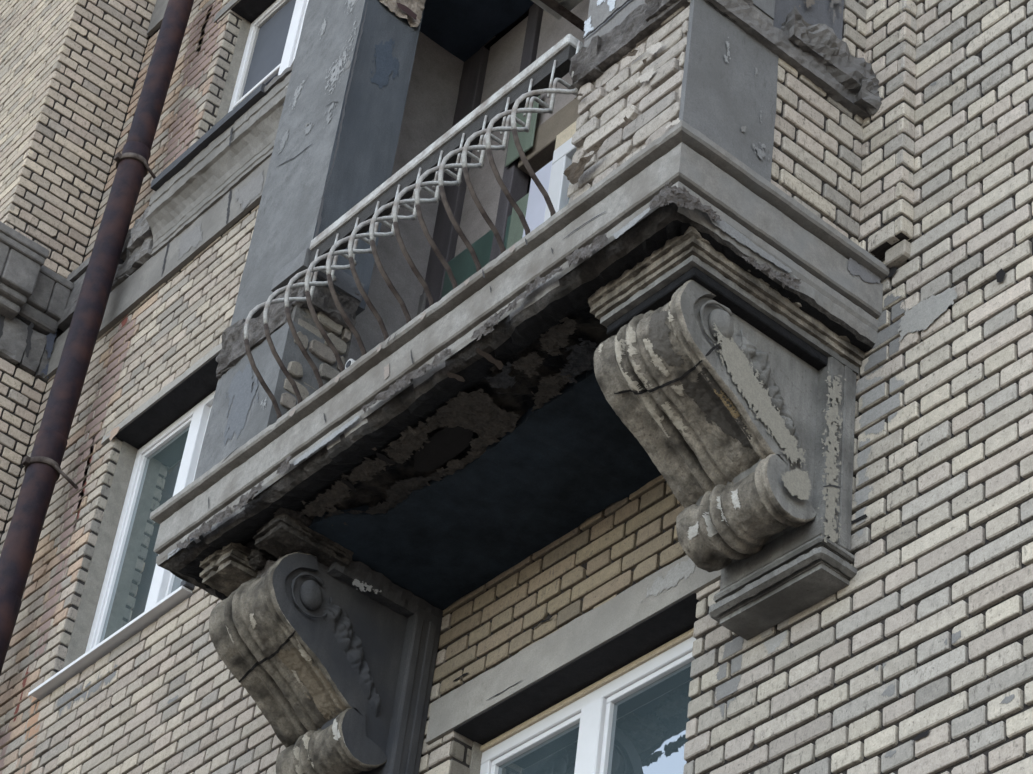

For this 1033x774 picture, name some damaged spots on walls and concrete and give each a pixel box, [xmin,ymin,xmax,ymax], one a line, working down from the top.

peeling [304,0,359,135]
spalling [380,0,425,27]
flaking render [563,0,690,204]
spalling [293,182,802,526]
crack [614,343,721,395]
peeling [712,323,867,543]
crack [238,631,296,683]